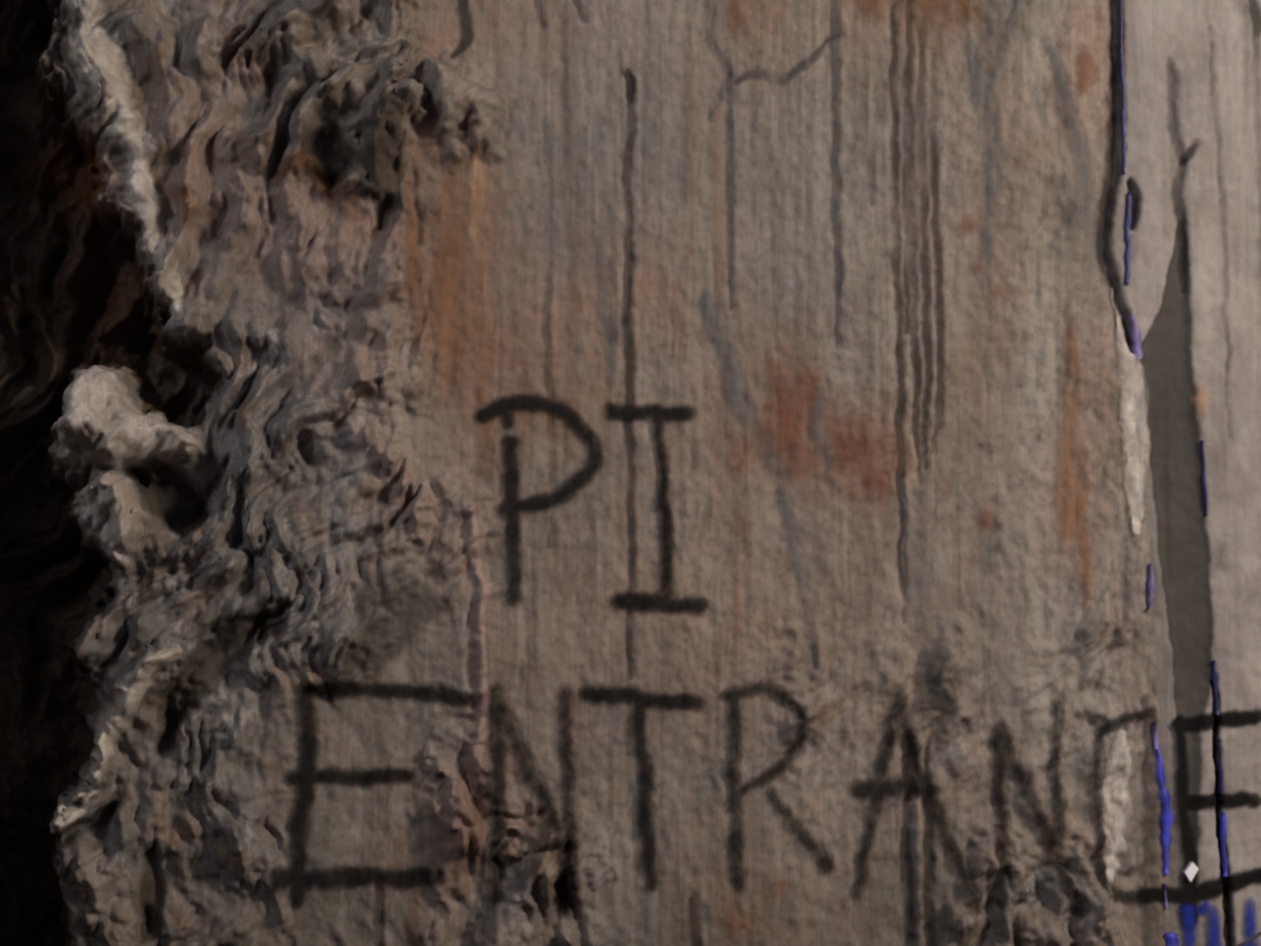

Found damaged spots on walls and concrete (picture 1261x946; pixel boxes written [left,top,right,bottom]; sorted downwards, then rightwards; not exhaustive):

crack [1097,0,1138,350]